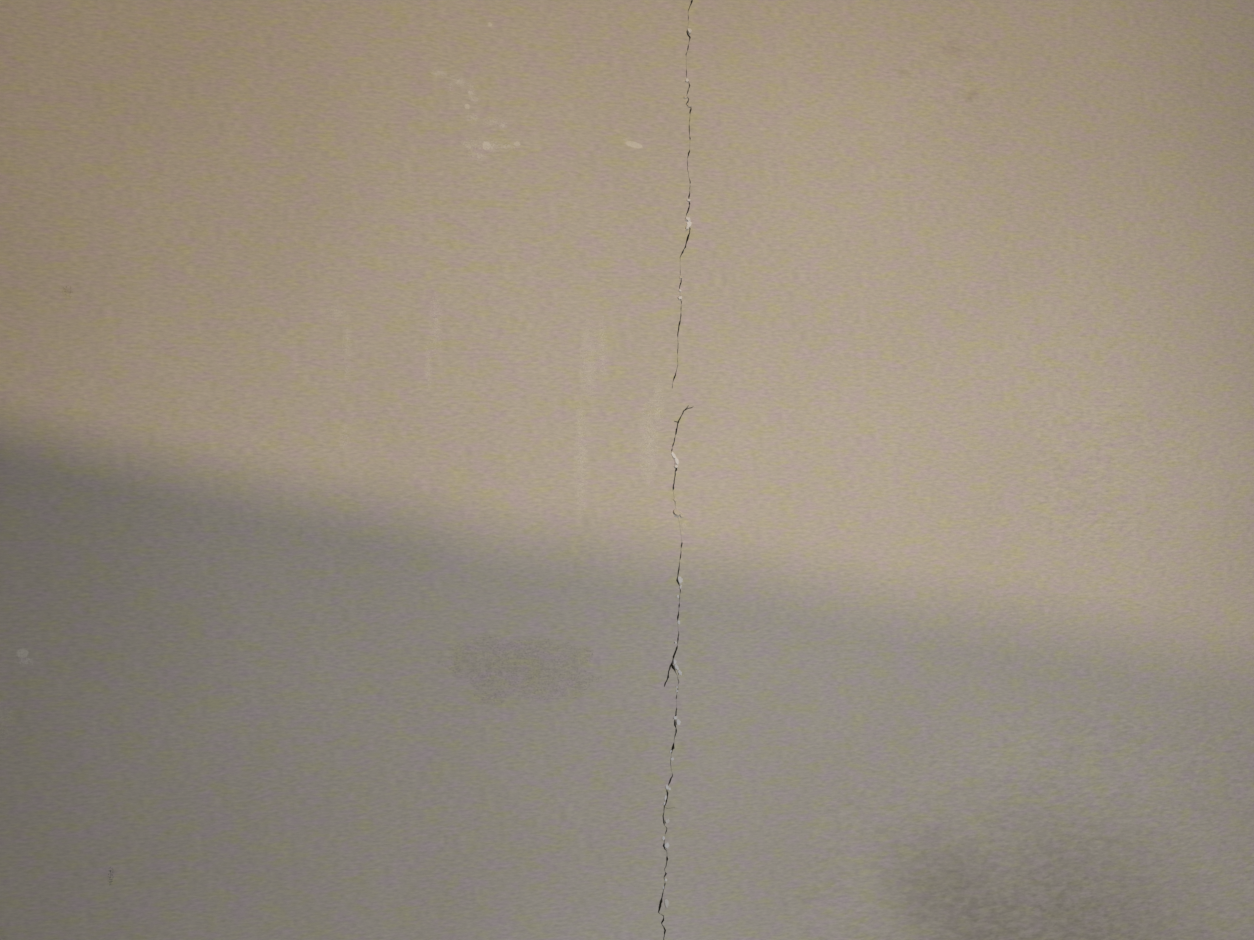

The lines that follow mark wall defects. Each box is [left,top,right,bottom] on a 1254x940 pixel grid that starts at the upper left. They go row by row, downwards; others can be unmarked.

crack [658,0,694,940]